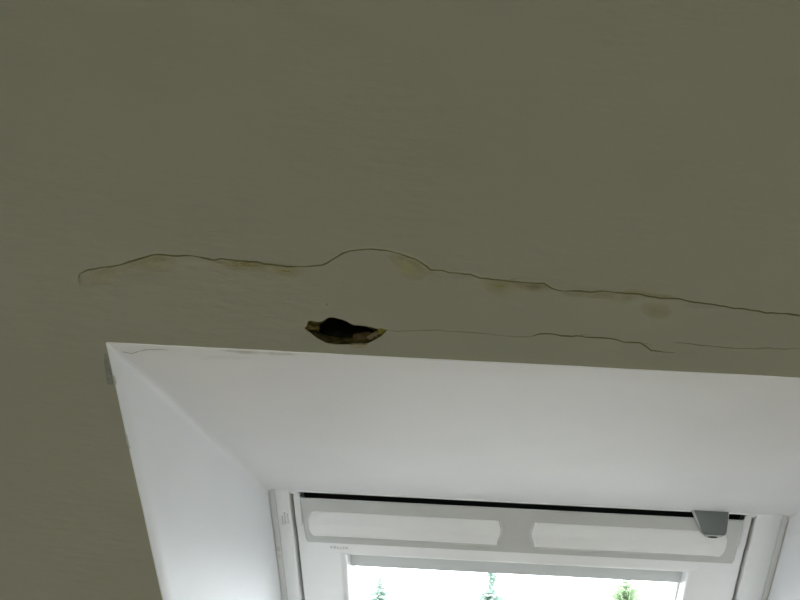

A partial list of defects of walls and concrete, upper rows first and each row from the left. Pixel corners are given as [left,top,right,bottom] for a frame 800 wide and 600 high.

crack [78,247,800,316]
spalling [306,318,385,349]
crack [386,329,798,353]